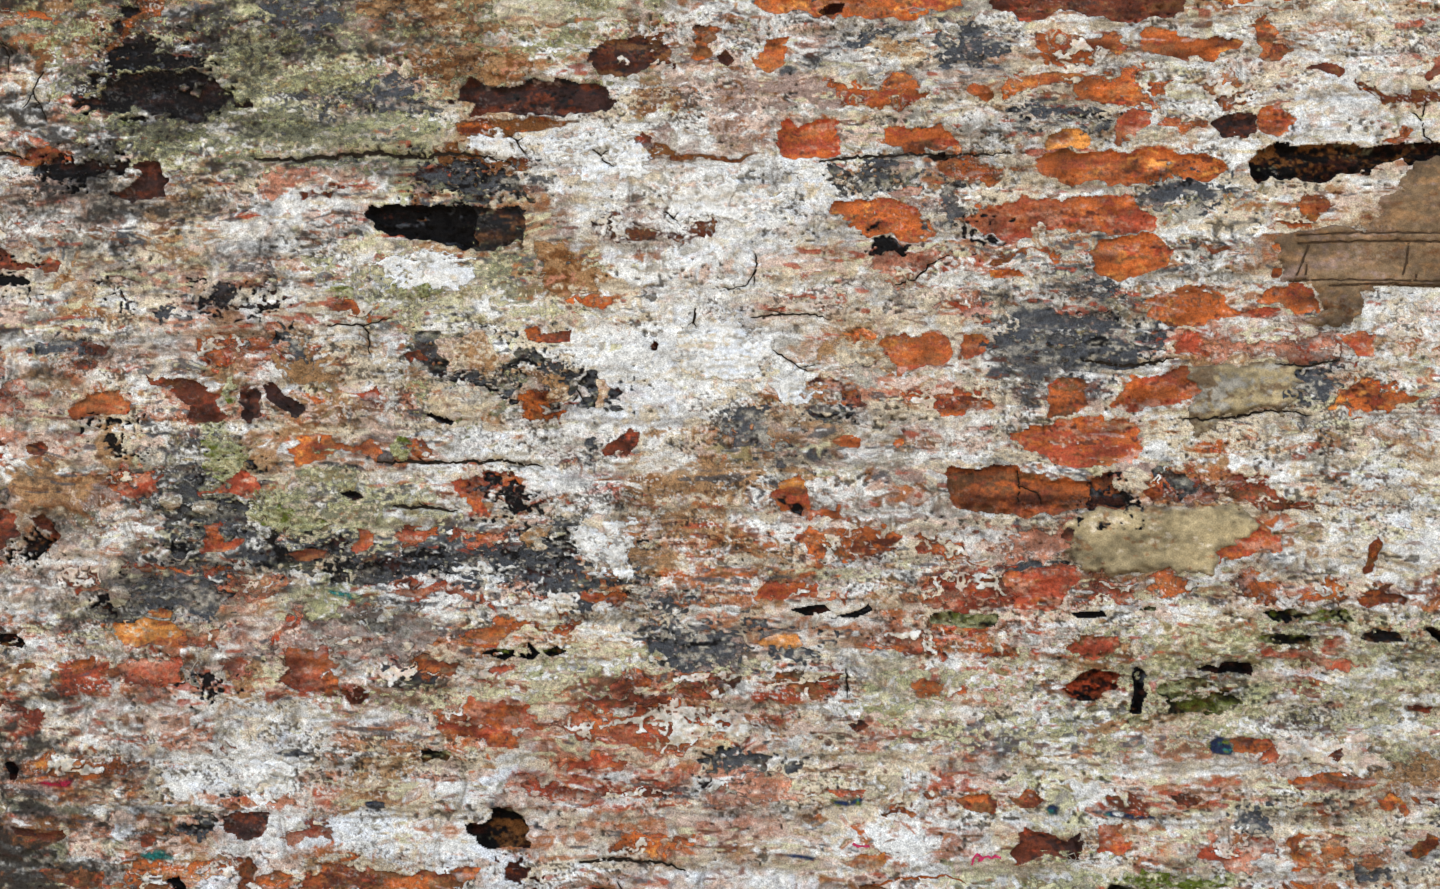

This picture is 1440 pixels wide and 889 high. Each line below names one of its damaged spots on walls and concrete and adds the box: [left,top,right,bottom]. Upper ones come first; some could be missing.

water stain [273,70,456,135]
spalling [448,24,734,118]
spalling [364,203,526,251]
water stain [972,272,1167,389]
flaking render [751,0,1440,715]
peeling [0,634,133,785]
peeling [121,521,754,862]
flaking render [39,807,481,889]
flaking render [881,787,1044,818]
spalling [1010,787,1154,866]
peeling [1197,830,1359,889]
flaking render [1288,748,1436,817]